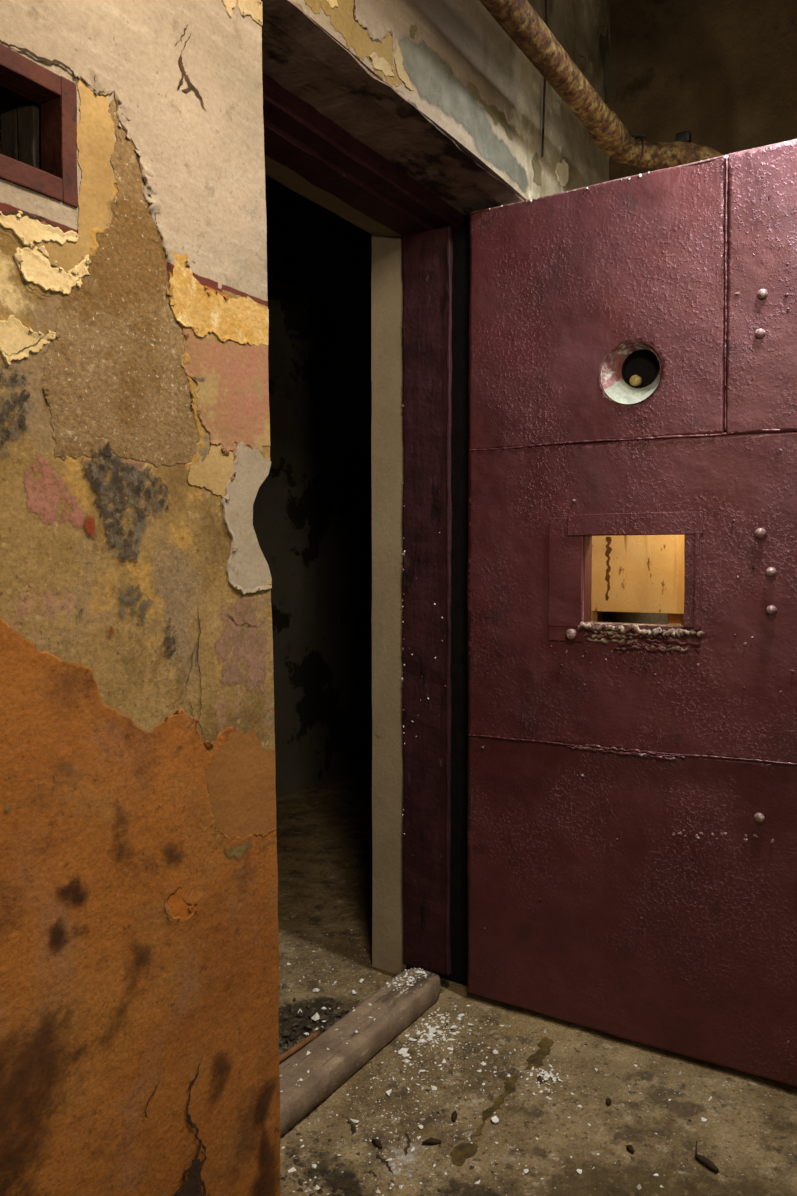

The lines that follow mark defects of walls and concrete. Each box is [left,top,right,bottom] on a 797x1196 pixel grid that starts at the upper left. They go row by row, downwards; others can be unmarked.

peeling [182,0,263,26]
crack [175,27,206,110]
peeling [305,0,532,202]
damp [0,365,34,457]
damp [82,443,169,564]
peeling [0,56,277,859]
damp [114,584,151,625]
damp [164,618,178,656]
damp [57,879,88,904]
crack [173,1058,210,1196]
damp [254,1082,277,1196]